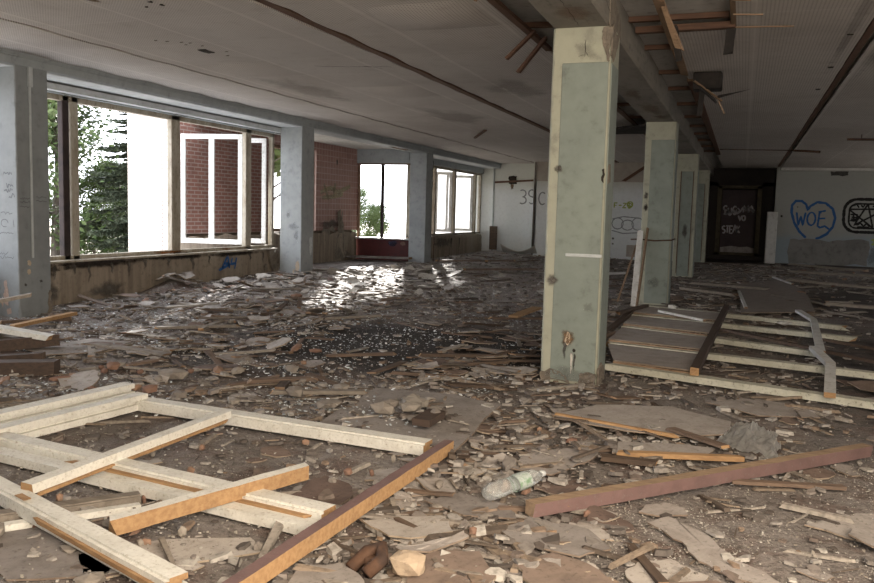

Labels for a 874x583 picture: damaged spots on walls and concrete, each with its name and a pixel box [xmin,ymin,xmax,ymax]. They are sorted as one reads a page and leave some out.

spalling [602,0,621,62]